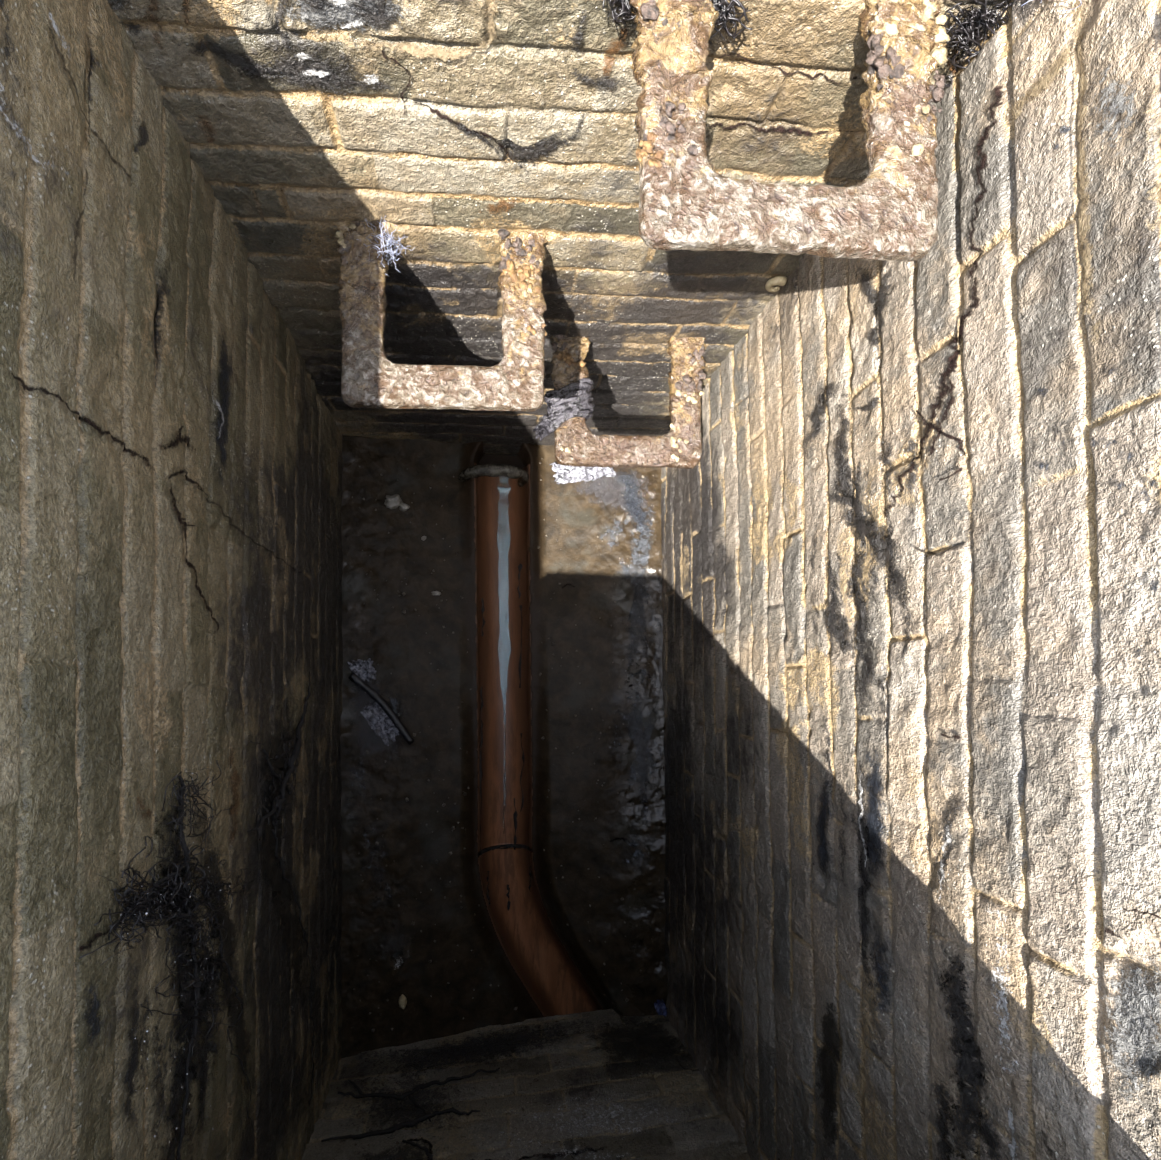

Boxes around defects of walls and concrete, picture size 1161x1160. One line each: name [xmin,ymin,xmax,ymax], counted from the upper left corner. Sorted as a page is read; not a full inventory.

leakage [172,0,498,97]
crack [366,41,510,157]
leakage [855,266,893,362]
crack [884,86,1004,518]
crack [9,371,300,634]
leakage [565,468,653,535]
leakage [803,382,919,733]
crack [914,547,953,556]
leakage [815,718,891,1011]
leakage [121,798,253,1160]
crack [472,1146,607,1160]
leakage [930,954,1017,1160]